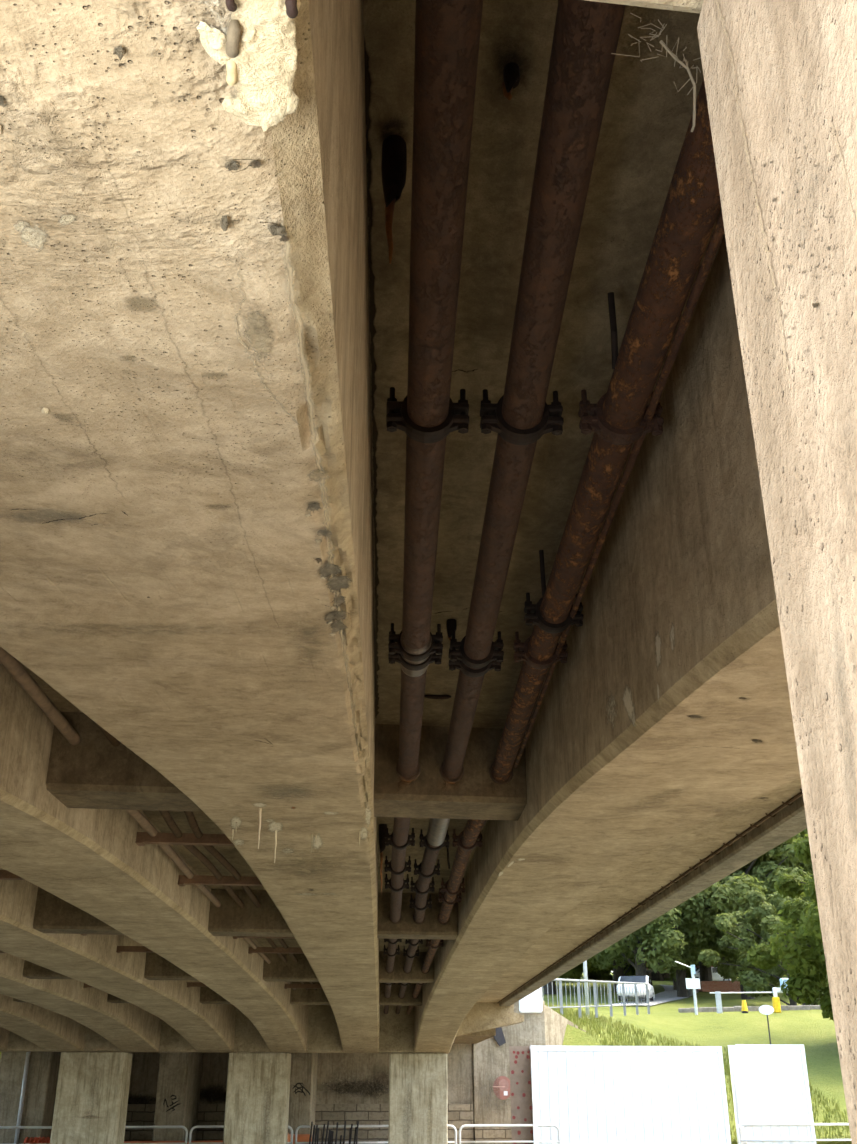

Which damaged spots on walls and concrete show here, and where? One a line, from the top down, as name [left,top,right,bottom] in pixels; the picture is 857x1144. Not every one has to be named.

spalling [196,0,301,132]
spalling [266,221,359,757]
efflorescence [254,802,294,863]